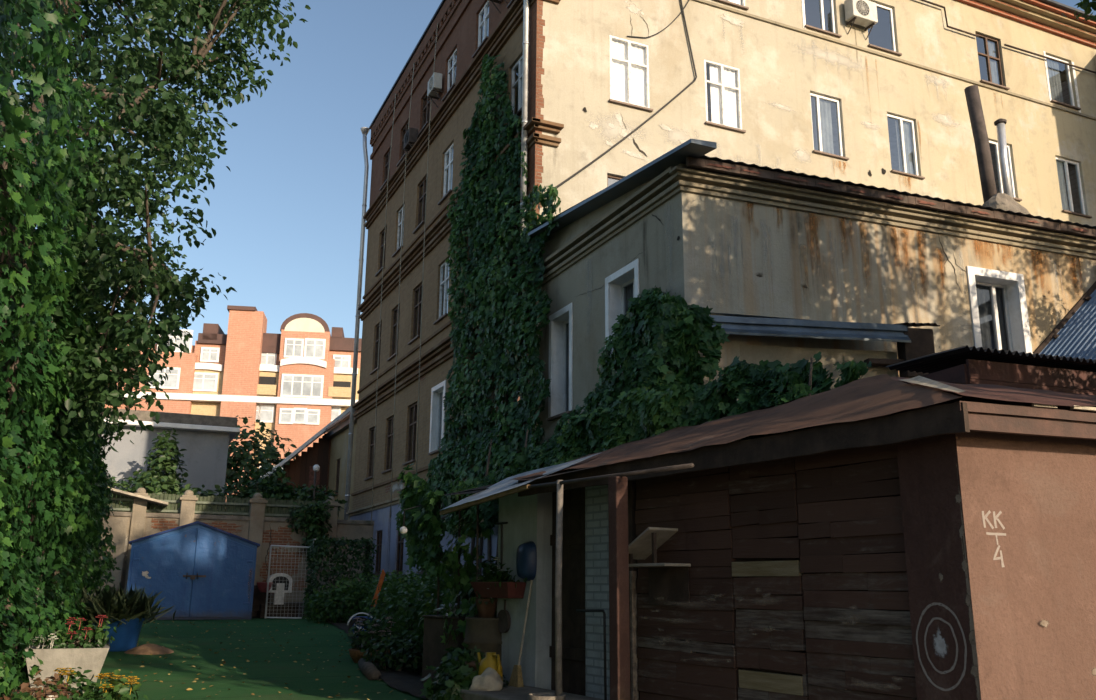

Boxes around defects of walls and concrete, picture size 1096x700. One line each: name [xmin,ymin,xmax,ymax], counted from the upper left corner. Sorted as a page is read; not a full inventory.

peeling [589,113,644,160]
crack [939,239,966,287]